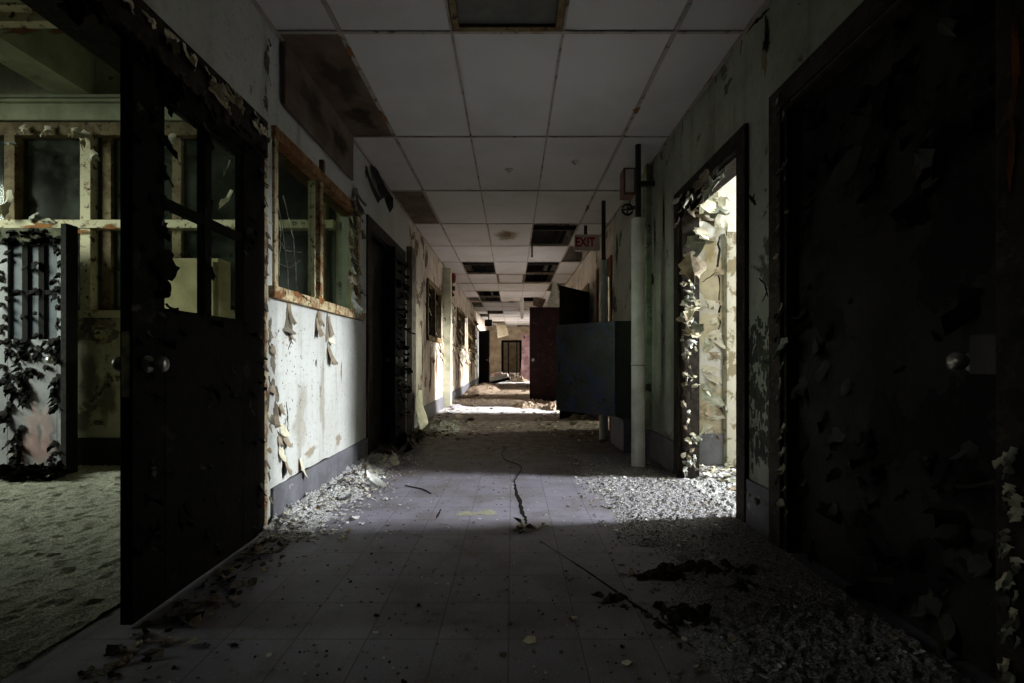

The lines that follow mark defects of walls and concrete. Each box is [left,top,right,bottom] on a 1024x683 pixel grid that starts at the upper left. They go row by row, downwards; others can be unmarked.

peeling [0,190,14,219]
peeling [28,212,55,224]
peeling [57,0,338,525]
leakage [498,231,516,240]
peeling [672,166,730,478]
peeling [744,303,789,516]